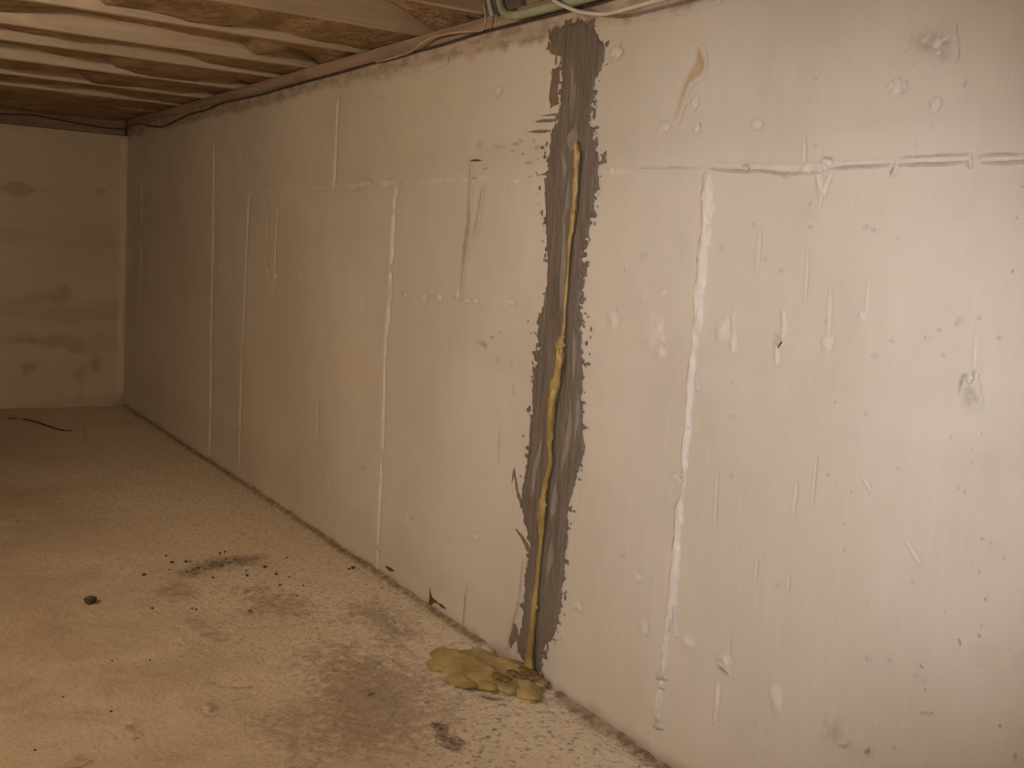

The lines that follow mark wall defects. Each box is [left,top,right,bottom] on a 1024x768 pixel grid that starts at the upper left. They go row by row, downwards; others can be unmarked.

damp [672,44,708,124]